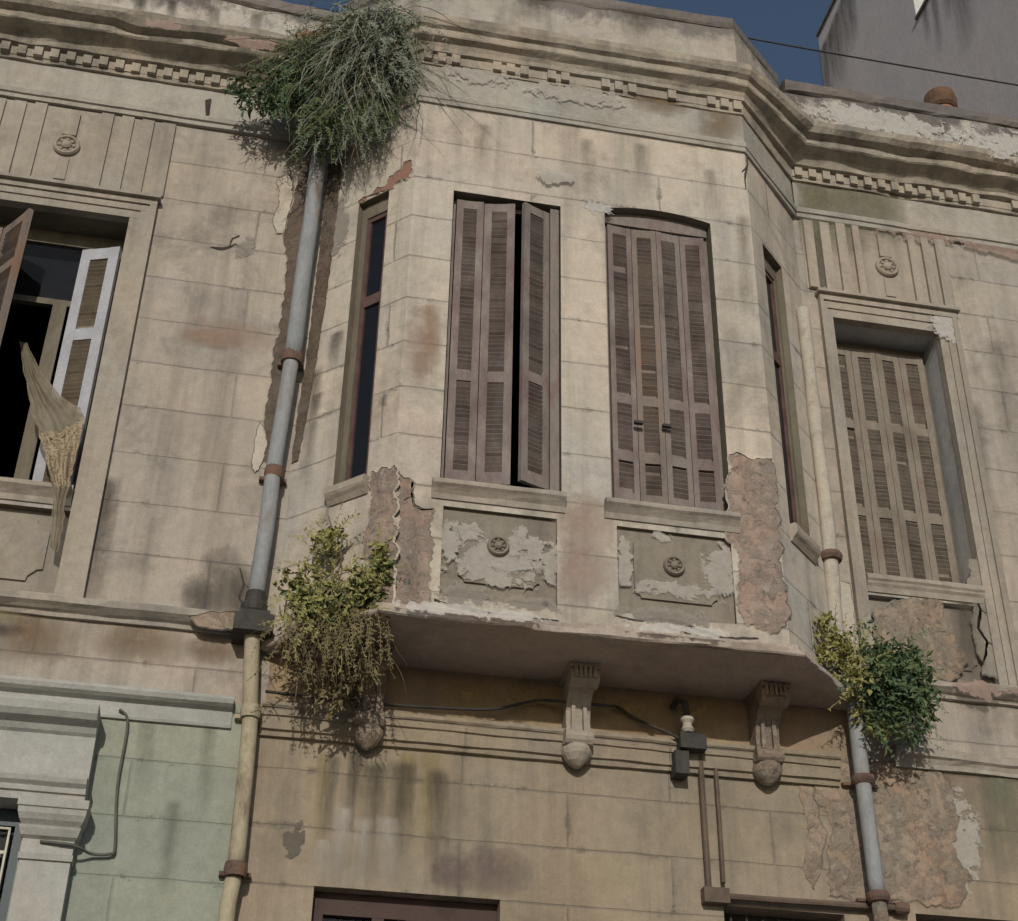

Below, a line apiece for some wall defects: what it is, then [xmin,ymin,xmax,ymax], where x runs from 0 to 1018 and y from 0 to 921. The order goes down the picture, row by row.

peeling [146,18,181,30]
peeling [799,100,1018,162]
peeling [272,174,294,234]
peeling [331,197,349,256]
spalling [358,158,415,204]
peeling [362,464,560,612]
spalling [618,452,792,635]
spalling [189,611,235,631]
crack [977,605,992,665]
spalling [283,821,305,859]
spalling [798,757,869,902]
spalling [868,758,983,910]